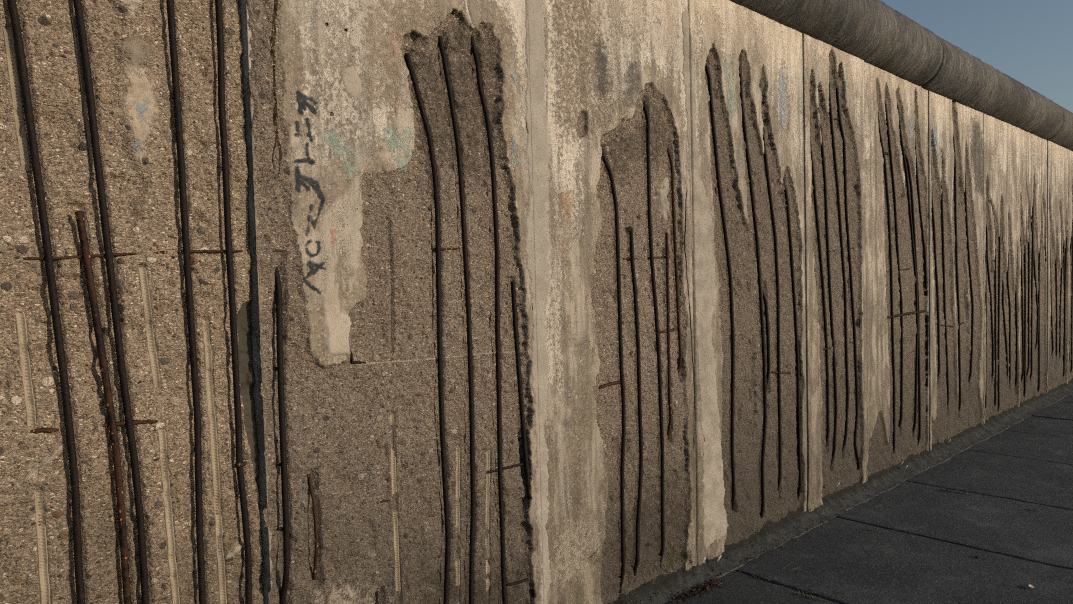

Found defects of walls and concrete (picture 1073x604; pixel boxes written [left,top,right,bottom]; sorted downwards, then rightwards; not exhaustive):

spalling [246,0,536,604]
spalling [576,109,589,139]
spalling [590,82,692,604]
spalling [704,43,1073,545]